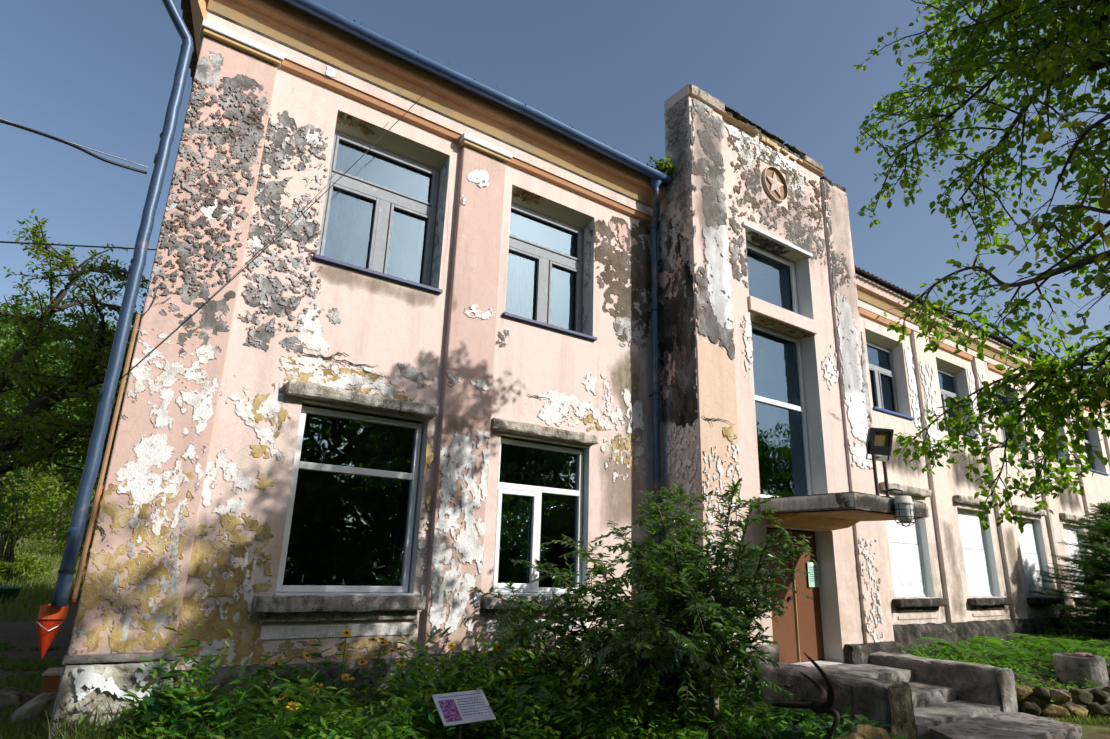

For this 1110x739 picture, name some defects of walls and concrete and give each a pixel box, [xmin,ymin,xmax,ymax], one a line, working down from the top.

crack [301,351,380,376]
peeling [464,304,497,319]
peeling [537,96,873,562]
peeling [858,538,884,643]